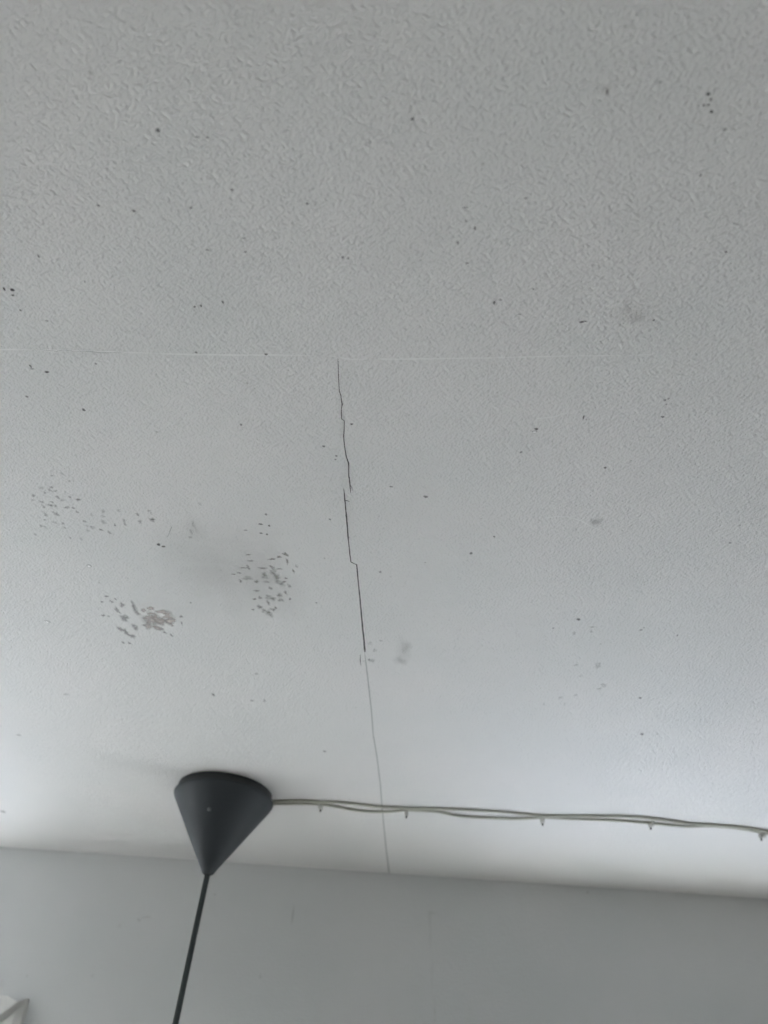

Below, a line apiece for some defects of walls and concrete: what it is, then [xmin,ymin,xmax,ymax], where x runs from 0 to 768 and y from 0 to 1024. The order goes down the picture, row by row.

crack [338,367,390,873]